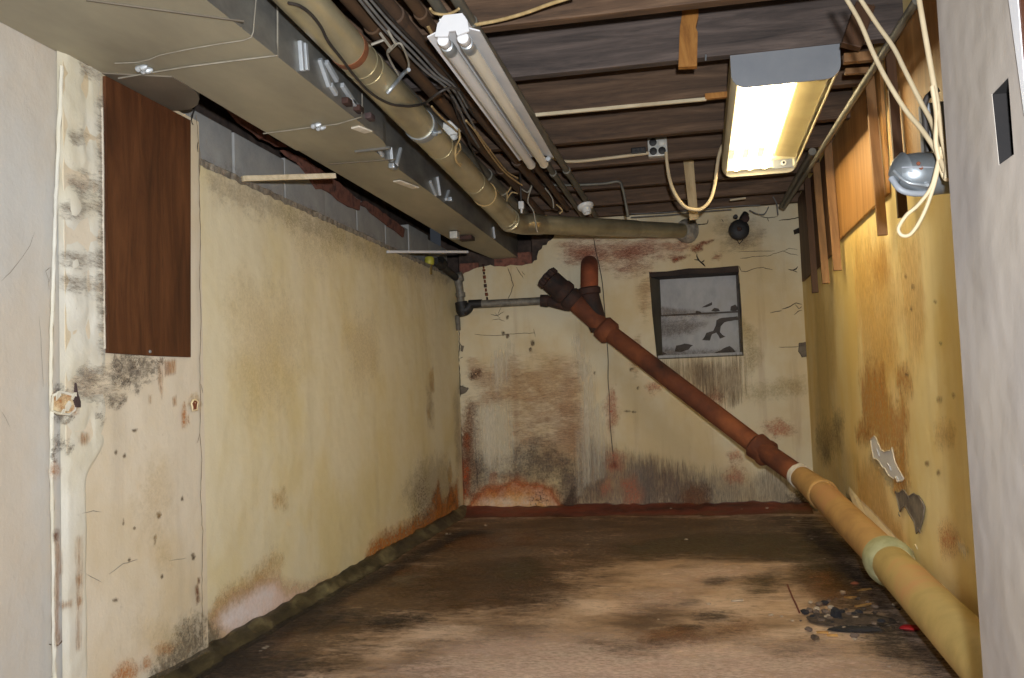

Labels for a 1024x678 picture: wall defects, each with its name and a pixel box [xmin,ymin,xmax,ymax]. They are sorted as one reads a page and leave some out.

crack [739,248,798,272]
crack [459,267,535,397]
spalling [50,383,81,416]
leakage [199,440,959,678]
peeling [847,487,898,539]
peeling [870,435,925,559]
leakage [152,578,308,677]